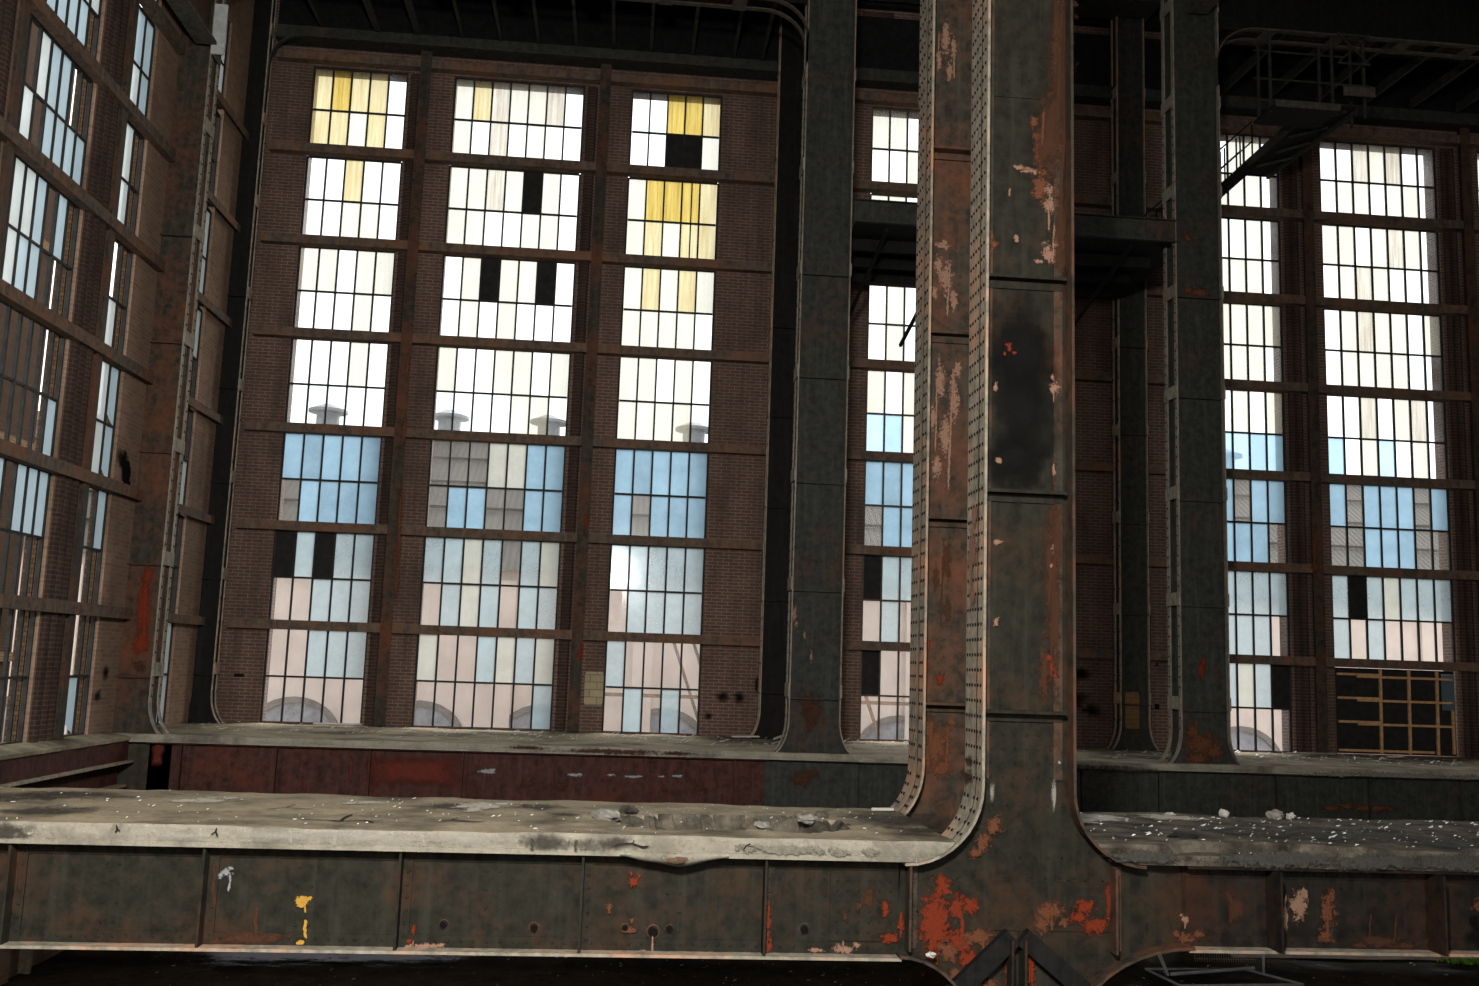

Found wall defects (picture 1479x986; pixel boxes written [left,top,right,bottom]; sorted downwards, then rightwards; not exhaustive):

peeling [1013,164,1059,264]
corrosion [969,814,1006,861]
corrosion [808,941,861,954]
corrosion [843,869,996,979]
corrosion [978,953,1036,986]
corrosion [1031,881,1110,936]
corrosion [1283,888,1422,949]